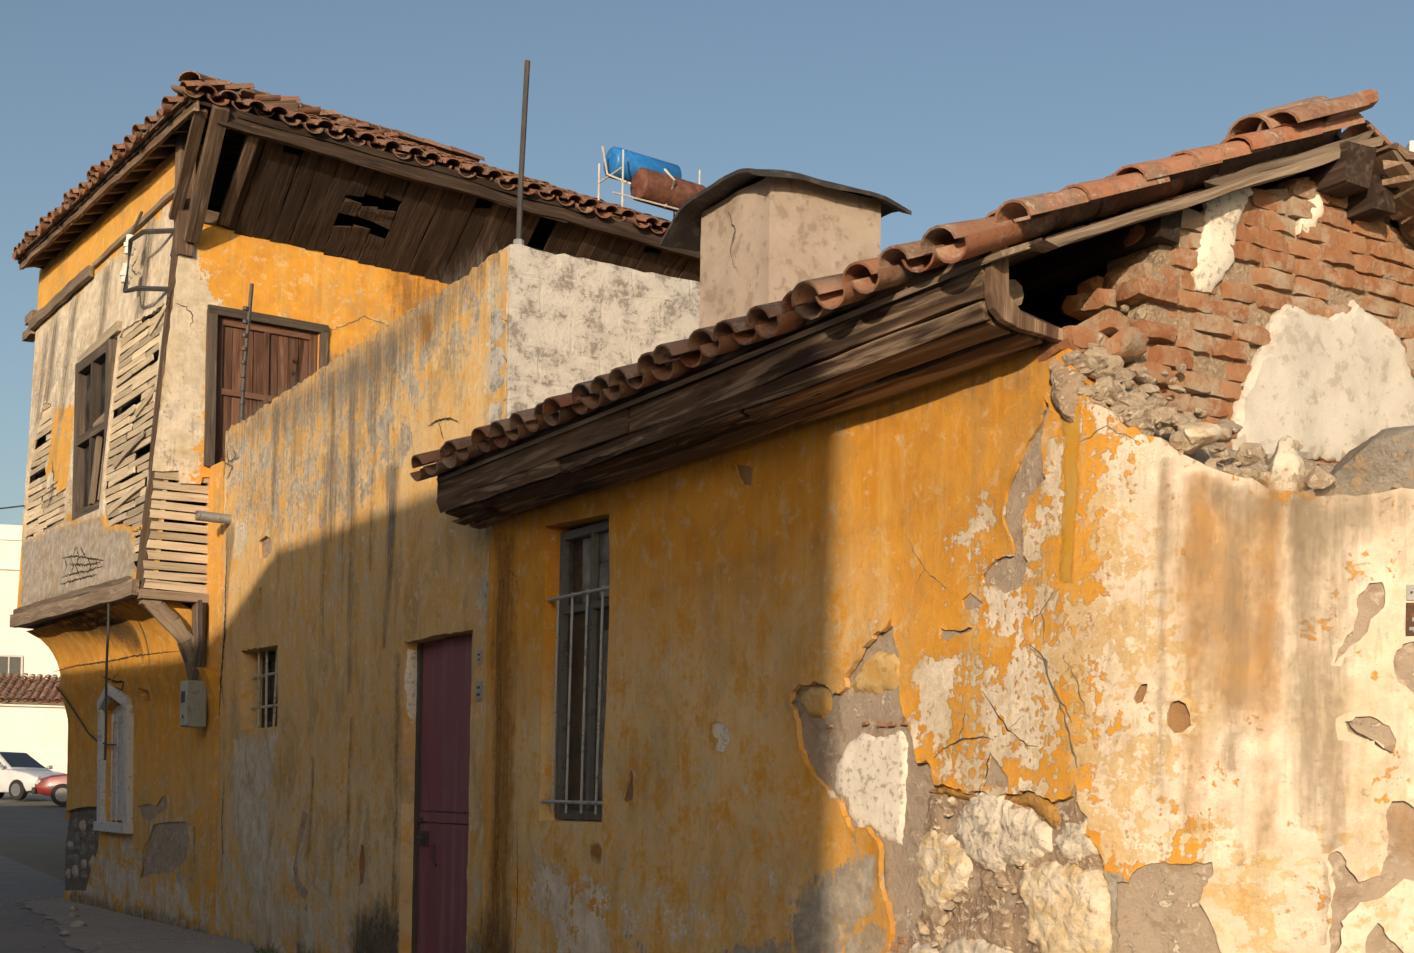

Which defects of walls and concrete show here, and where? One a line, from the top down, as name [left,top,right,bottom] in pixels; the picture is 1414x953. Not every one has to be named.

leakage [244,273,442,536]
spalling [65,807,99,891]
leakage [353,900,399,953]
leakage [371,467,395,595]
flaking render [963,402,1048,610]
flaking render [793,627,1221,953]
crack [934,592,1087,782]
leakage [1187,492,1279,709]
flaking render [1334,582,1385,664]
flaking render [1345,716,1396,754]
flaking render [1328,801,1414,953]
flaking render [1393,642,1414,693]